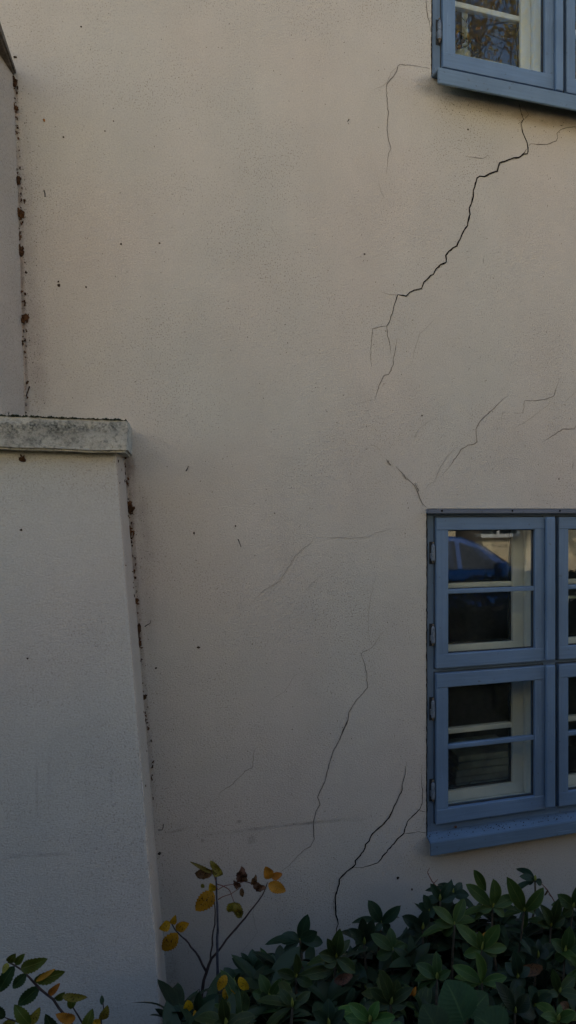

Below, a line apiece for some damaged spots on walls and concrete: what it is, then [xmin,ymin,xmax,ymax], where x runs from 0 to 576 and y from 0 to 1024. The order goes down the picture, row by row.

crack [371,64,429,195]
crack [361,105,572,403]
crack [371,381,570,508]
crack [280,581,384,873]
crack [333,762,426,932]